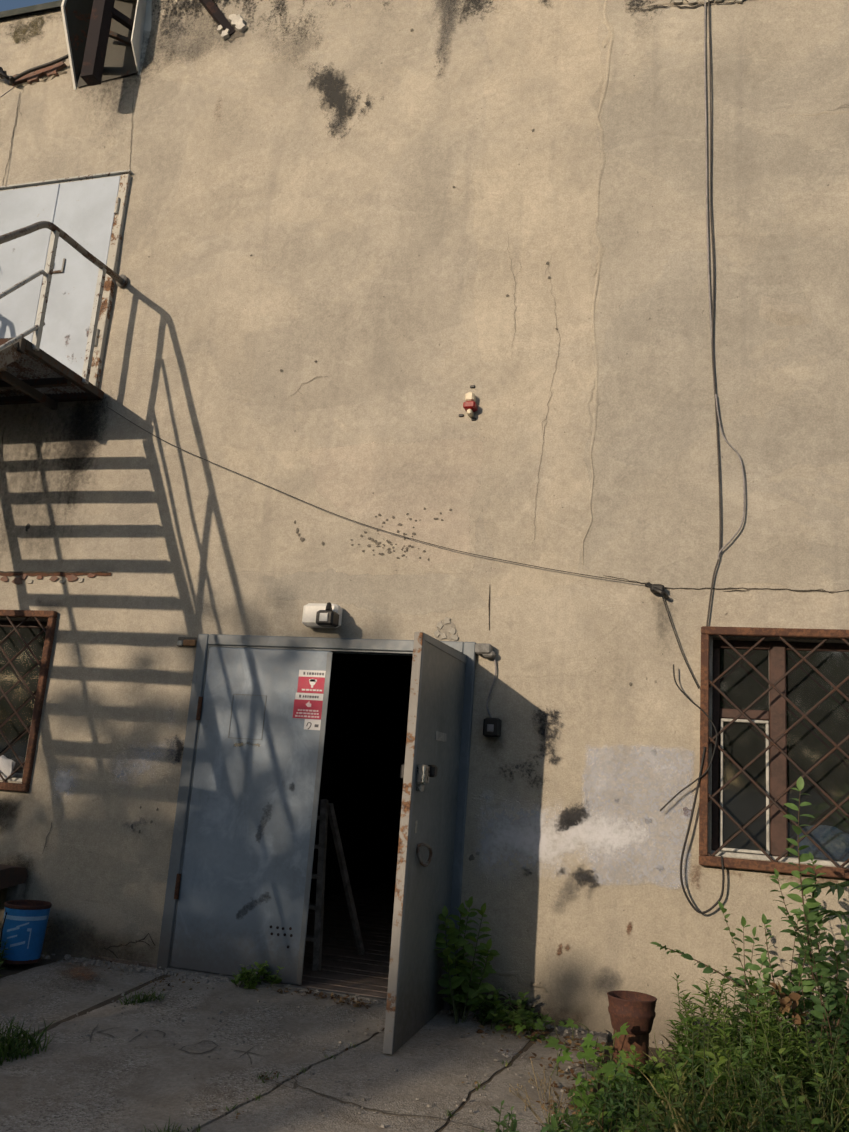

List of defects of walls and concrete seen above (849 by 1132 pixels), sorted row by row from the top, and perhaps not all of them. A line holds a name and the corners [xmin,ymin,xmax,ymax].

leakage [153,0,314,44]
leakage [439,0,492,50]
crack [630,0,743,12]
leakage [309,66,370,138]
spalling [0,571,111,584]
leakage [535,712,563,765]
leakage [558,801,588,831]
leakage [568,867,598,894]